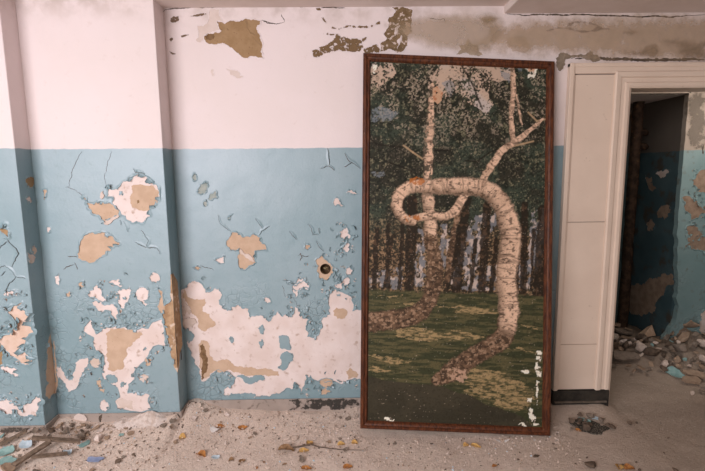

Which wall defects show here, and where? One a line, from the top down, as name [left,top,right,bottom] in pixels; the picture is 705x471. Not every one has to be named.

flaking render [195,8,264,60]
leakage [490,20,705,58]
peeling [76,173,161,264]
peeling [681,168,705,257]
crack [0,239,26,290]
peeling [629,273,675,317]
peeling [0,221,361,422]